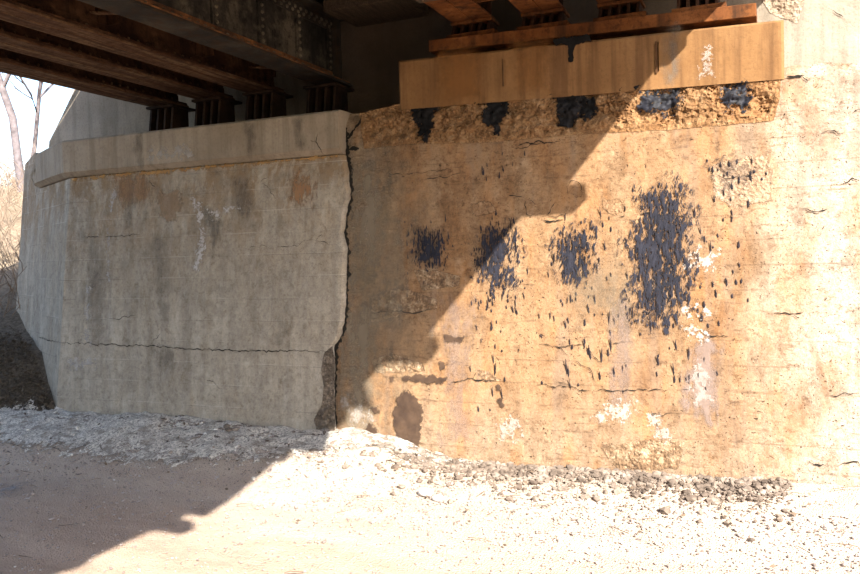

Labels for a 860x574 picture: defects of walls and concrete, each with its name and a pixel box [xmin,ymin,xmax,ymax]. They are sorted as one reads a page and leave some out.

spalling [359,80,781,149]
water stain [577,96,598,121]
crack [39,116,362,429]
water stain [338,152,448,447]
efflorescence [683,246,720,272]
spalling [314,347,335,431]